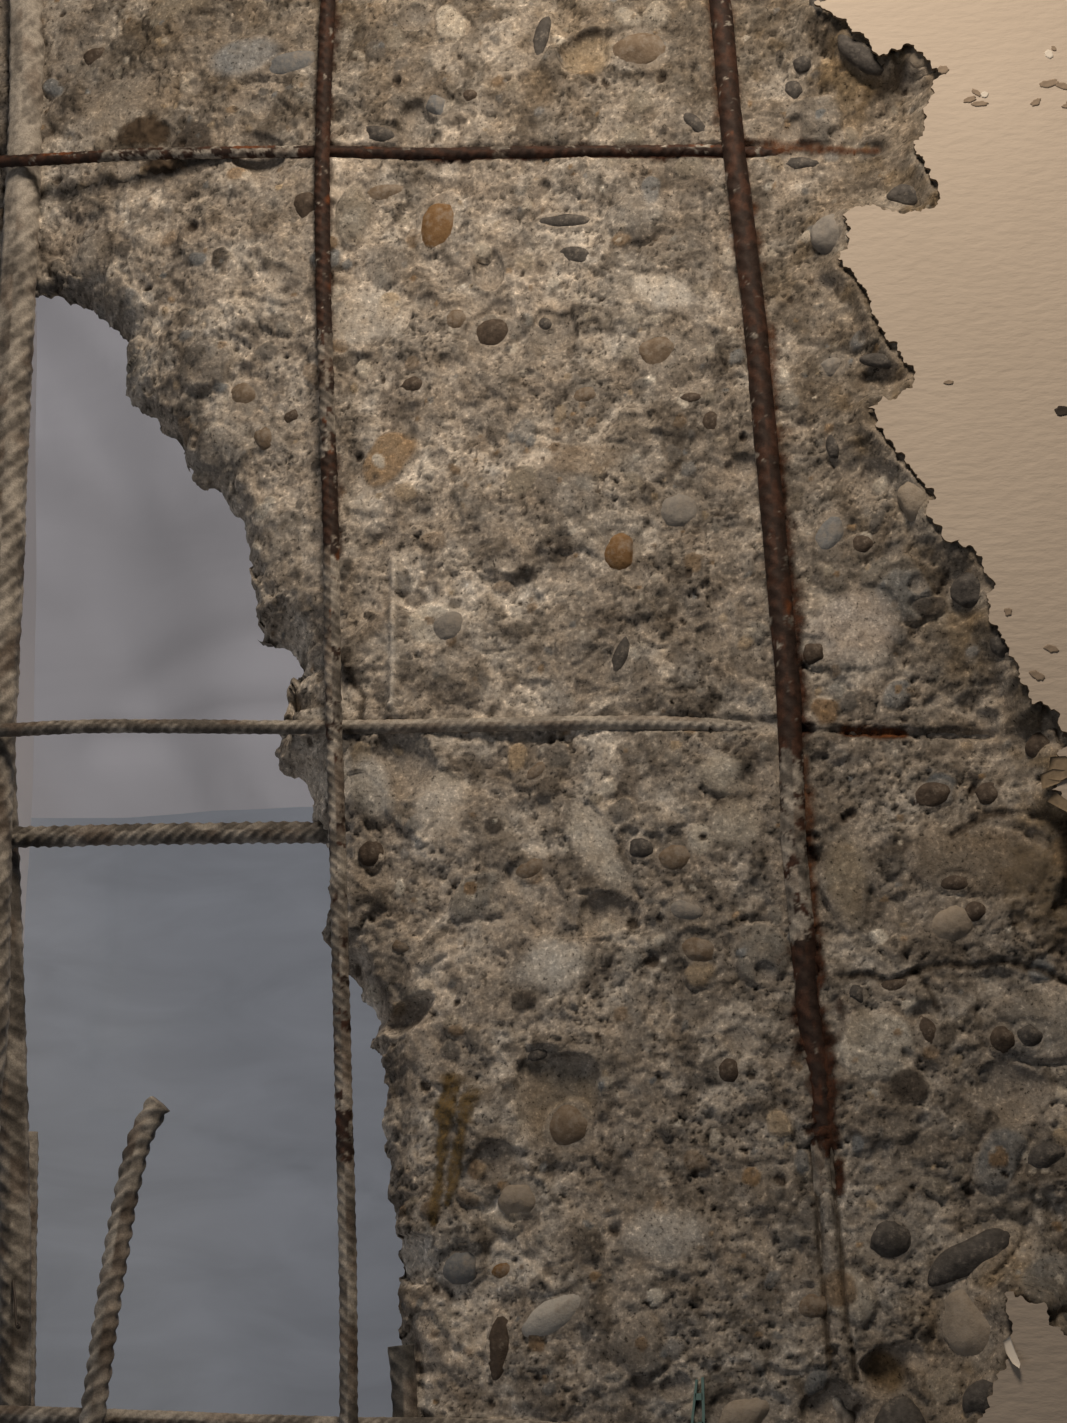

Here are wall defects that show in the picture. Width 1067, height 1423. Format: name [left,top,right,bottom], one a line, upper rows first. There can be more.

spalling [0,0,10,277]
corrosion [744,138,878,154]
spalling [35,0,329,848]
spalling [322,881,332,949]
spalling [330,0,1067,1423]
corrosion [777,428,845,1196]
corrosion [841,725,907,738]